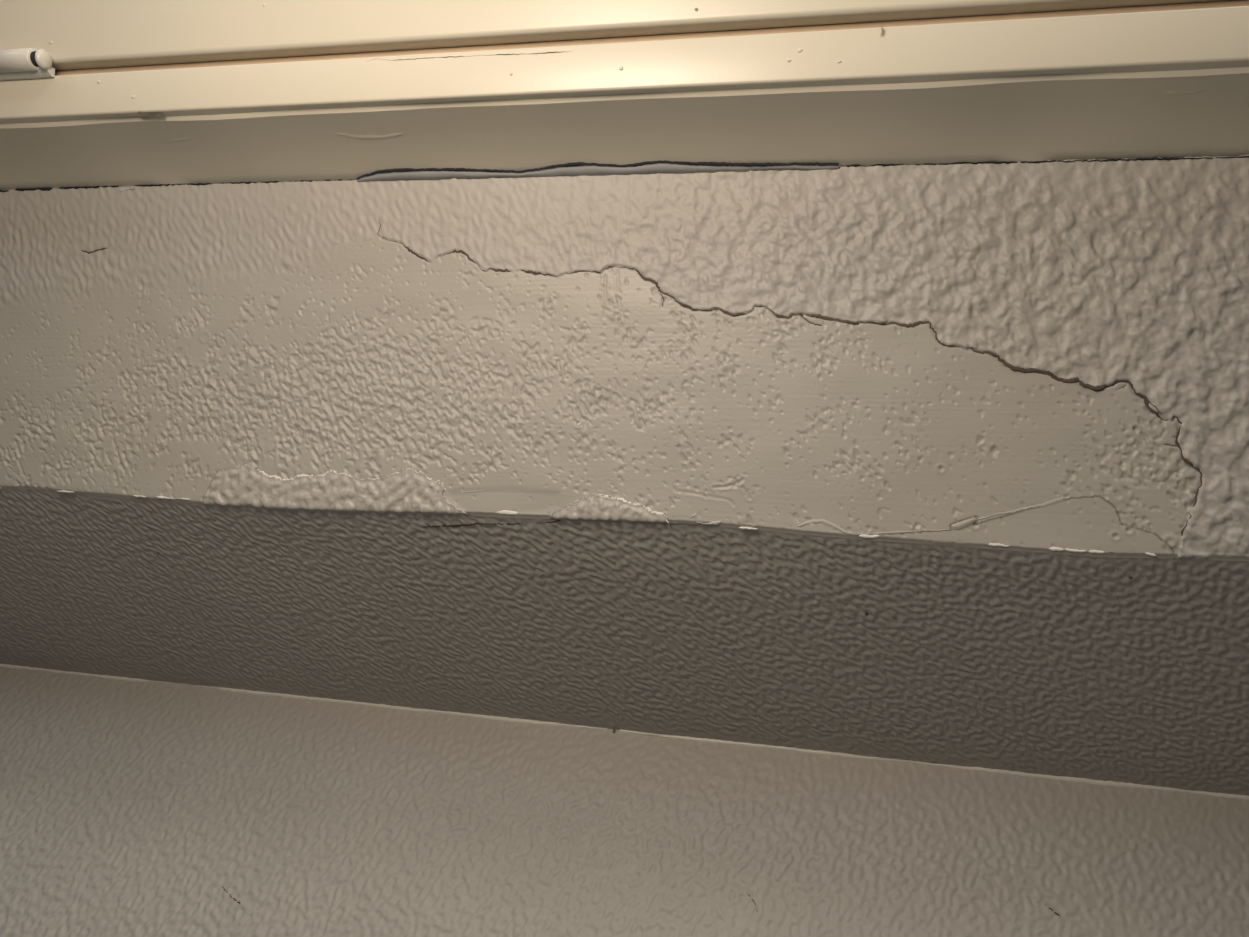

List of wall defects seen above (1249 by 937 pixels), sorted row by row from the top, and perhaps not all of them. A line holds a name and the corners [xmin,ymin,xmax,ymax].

crack [0,156,1249,192]